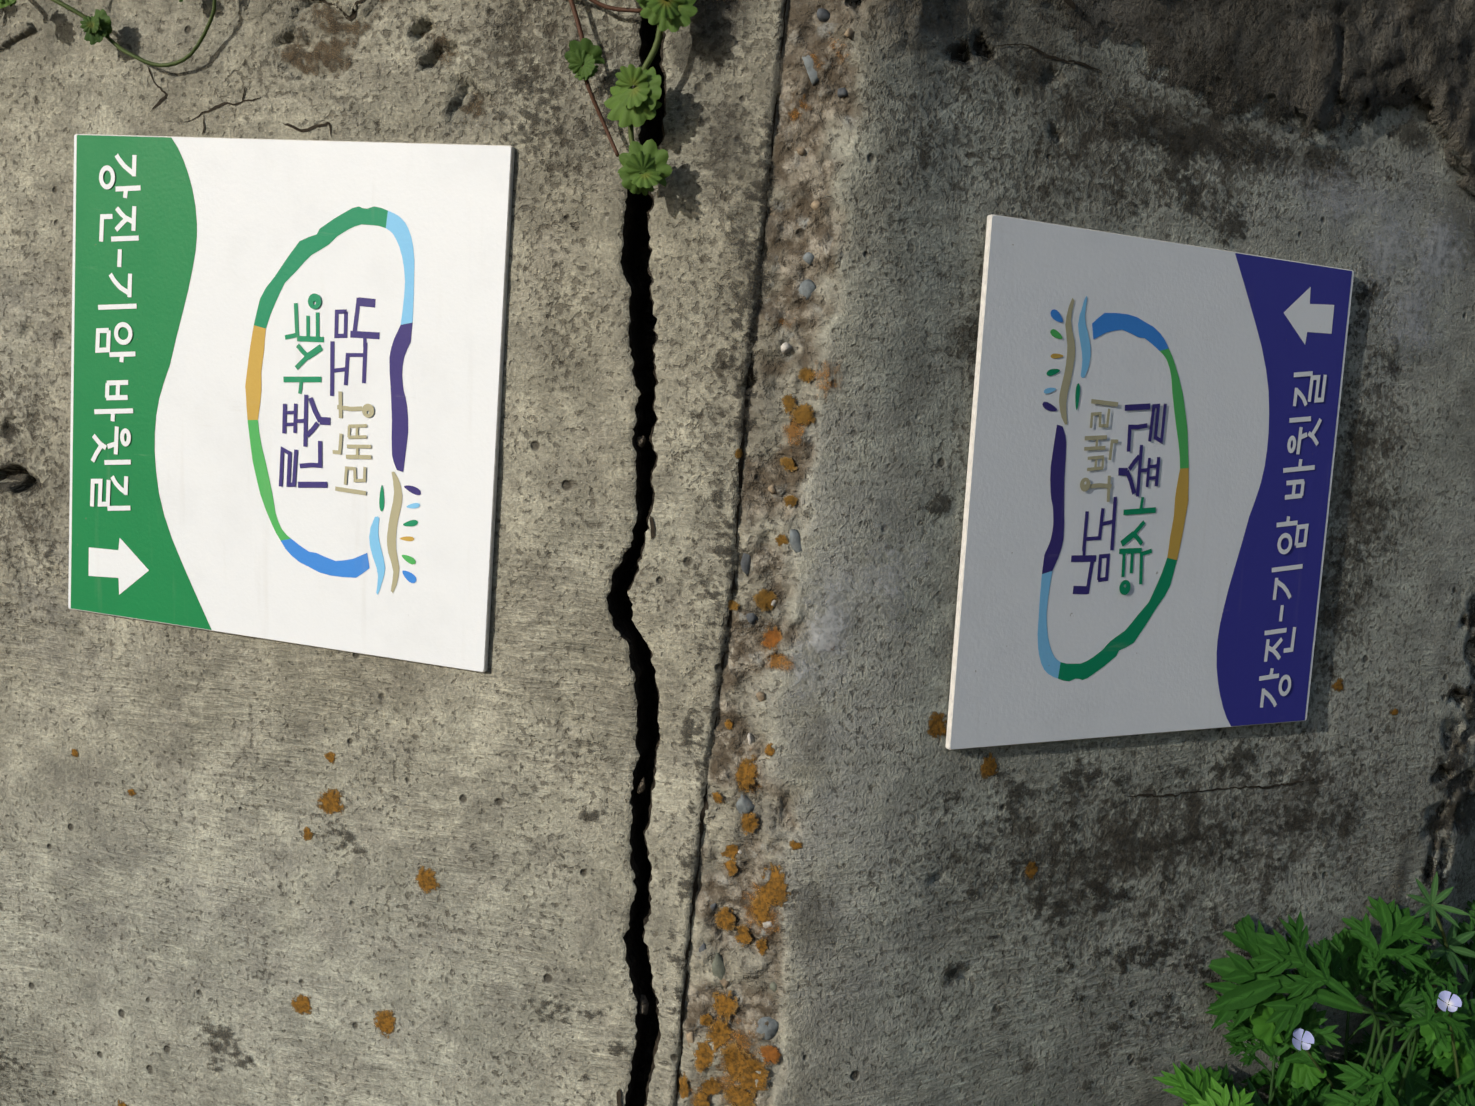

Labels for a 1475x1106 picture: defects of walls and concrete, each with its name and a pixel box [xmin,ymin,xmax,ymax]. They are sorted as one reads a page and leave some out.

crack [606,17,667,1106]
crack [996,43,1106,72]